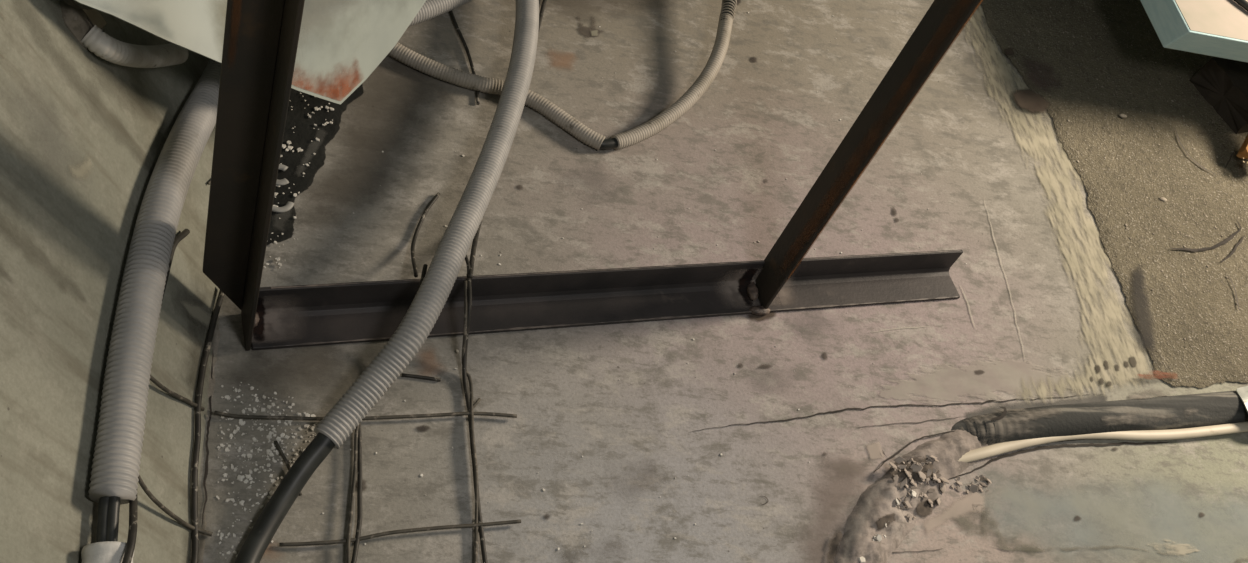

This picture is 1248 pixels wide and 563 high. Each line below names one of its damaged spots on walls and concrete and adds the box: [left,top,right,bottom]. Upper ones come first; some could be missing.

crack [691,394,1089,472]
spalling [873,454,992,542]
crack [949,442,1168,479]